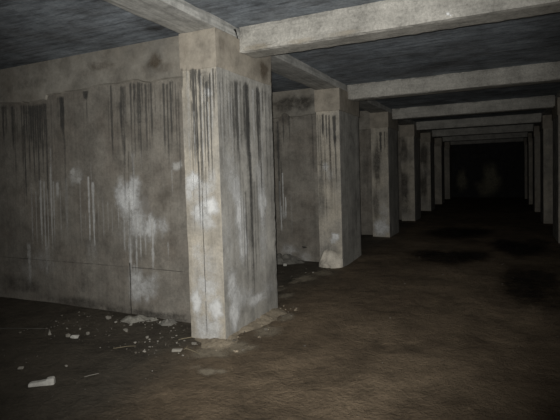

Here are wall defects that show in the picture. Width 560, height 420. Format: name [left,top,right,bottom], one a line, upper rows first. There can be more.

leakage [190,69,214,170]
leakage [228,82,262,187]
leakage [322,115,336,143]
leakage [32,166,59,246]
leakage [116,179,156,268]
leakage [186,172,218,227]
leakage [232,179,253,258]
leakage [258,178,267,222]